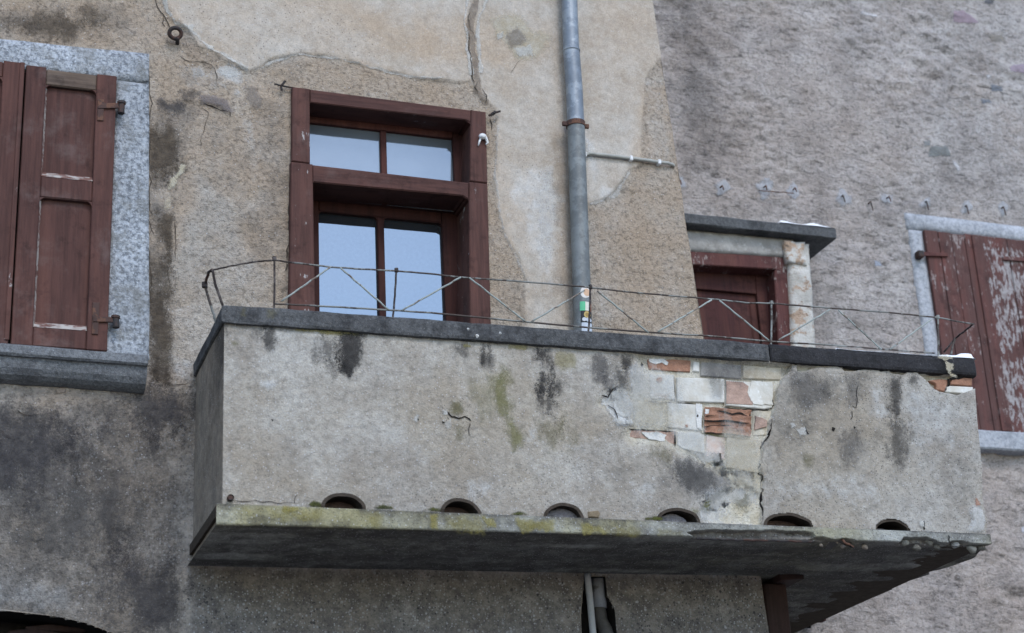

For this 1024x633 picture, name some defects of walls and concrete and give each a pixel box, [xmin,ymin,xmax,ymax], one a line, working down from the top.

crack [464,0,492,130]
damp [149,125,187,188]
damp [155,211,175,264]
damp [335,333,364,377]
damp [535,347,558,413]
flaking render [601,359,781,484]
damp [887,375,902,416]
crack [757,419,772,521]
flaking render [700,490,726,518]
damp [97,540,191,633]